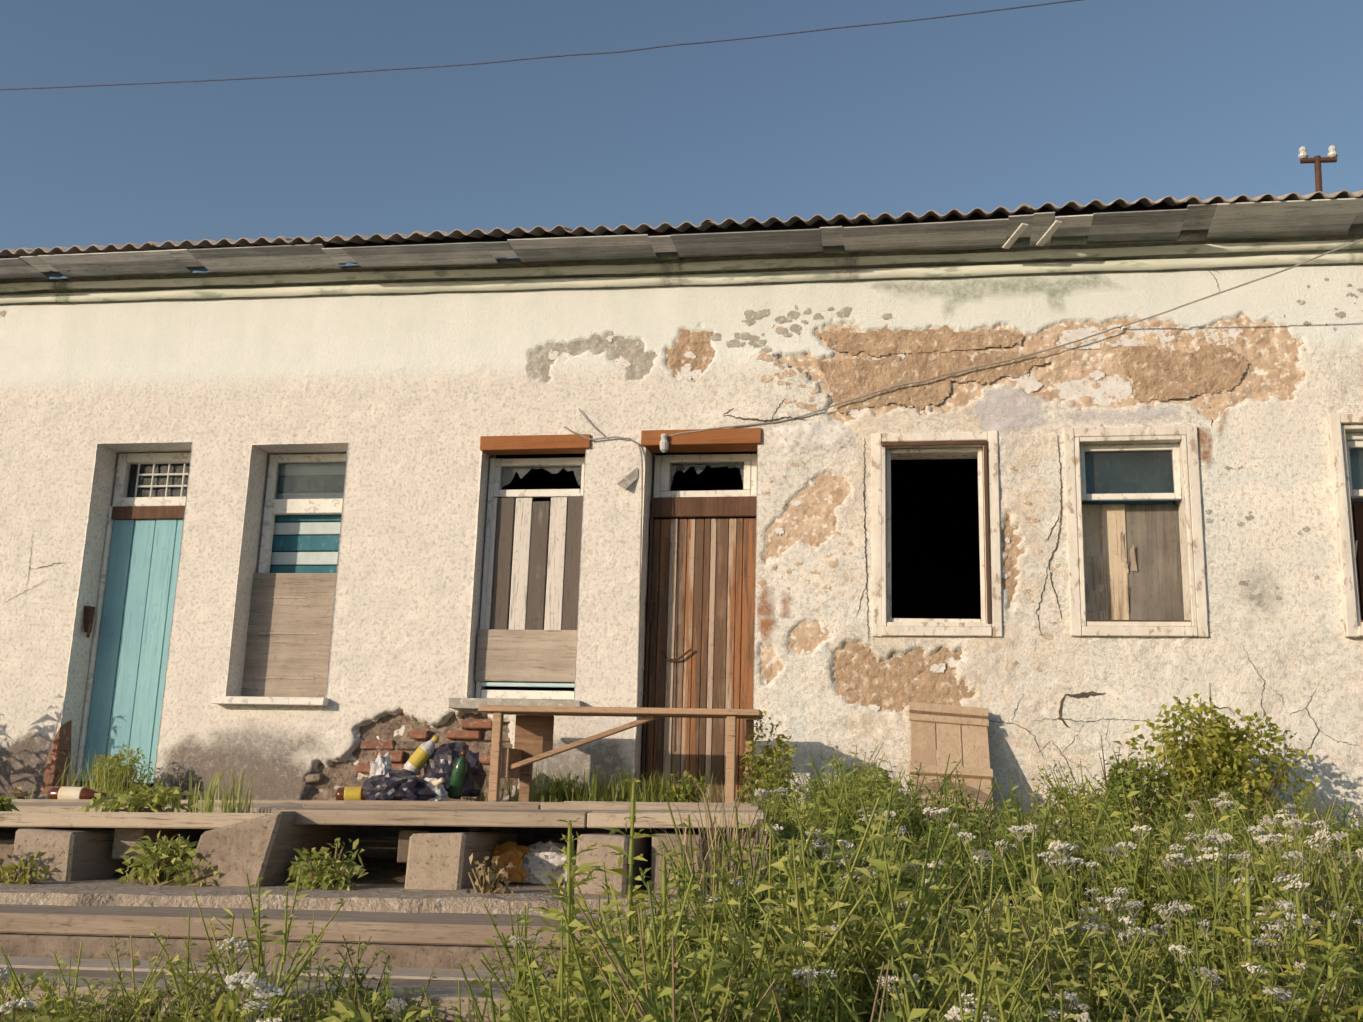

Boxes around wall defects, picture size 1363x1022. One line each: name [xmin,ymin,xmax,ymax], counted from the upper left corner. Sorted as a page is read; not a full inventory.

spalling [528,284,1363,424]
flaking render [756,459,853,590]
spalling [759,620,975,713]